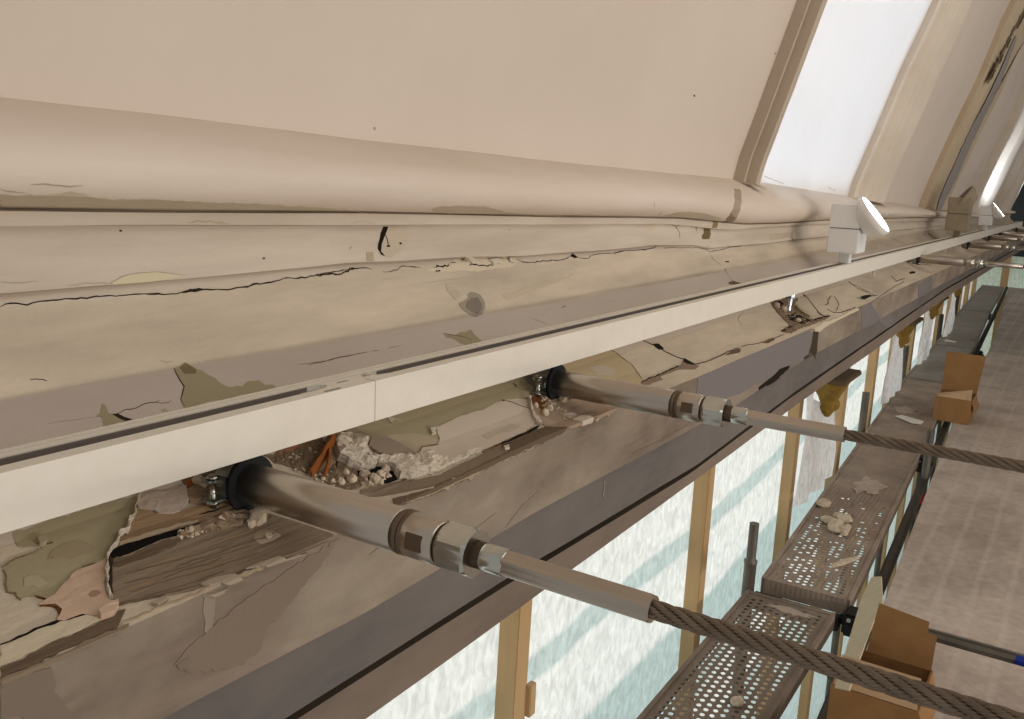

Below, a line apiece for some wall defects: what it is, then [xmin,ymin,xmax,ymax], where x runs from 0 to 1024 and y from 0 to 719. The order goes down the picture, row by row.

crack [0,203,739,307]
spalling [763,271,916,343]
crack [803,276,905,321]
crack [612,310,784,382]
peeling [96,404,125,426]
peeling [175,362,276,408]
peeling [264,394,617,503]
peeling [0,491,309,667]